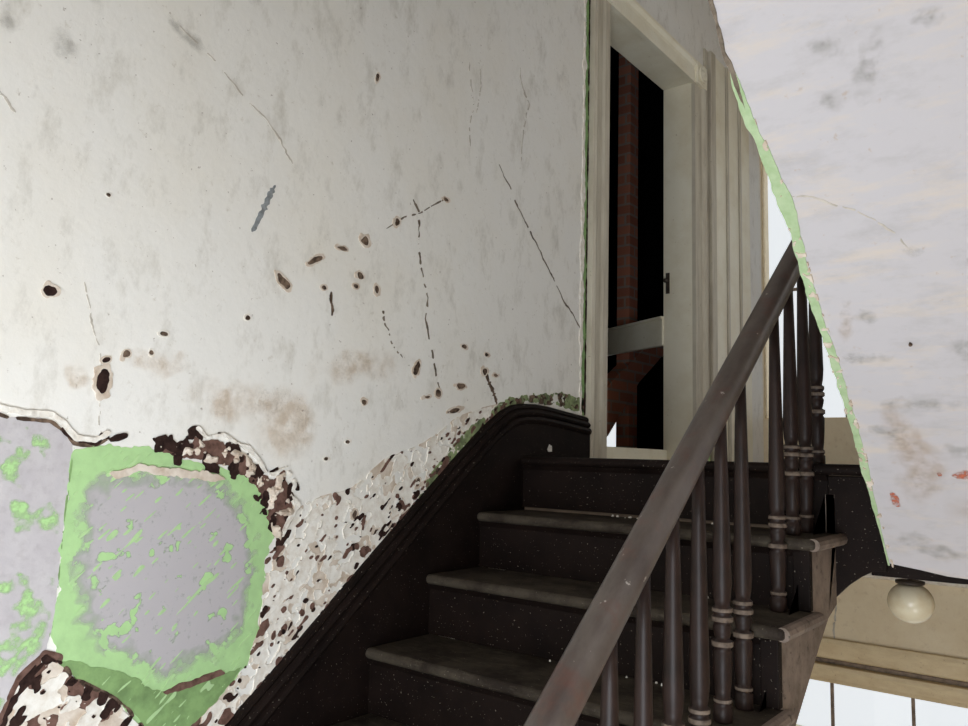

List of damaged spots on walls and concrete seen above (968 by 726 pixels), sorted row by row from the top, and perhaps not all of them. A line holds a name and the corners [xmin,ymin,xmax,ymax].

peeling [0,0,591,726]
crack [386,199,444,388]
crack [499,68,580,328]